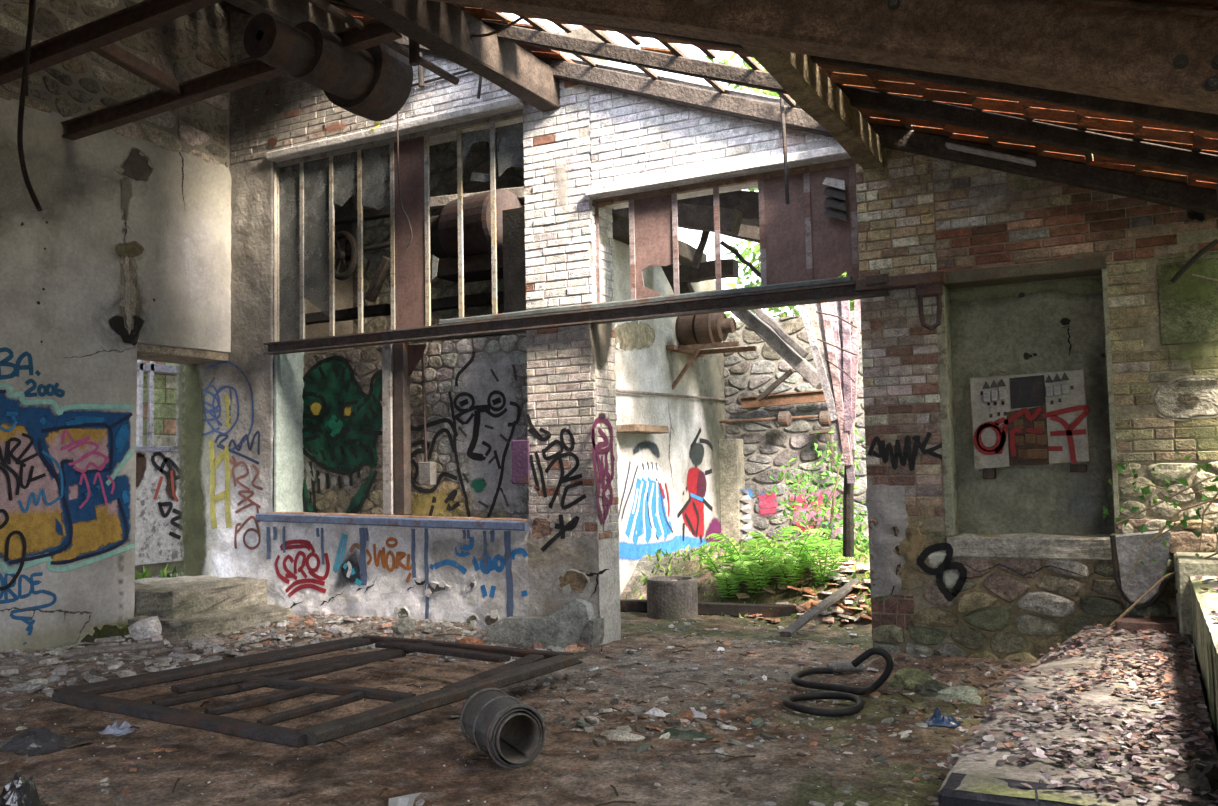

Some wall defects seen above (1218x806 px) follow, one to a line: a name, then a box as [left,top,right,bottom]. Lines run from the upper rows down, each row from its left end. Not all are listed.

crack [177,108,186,212]